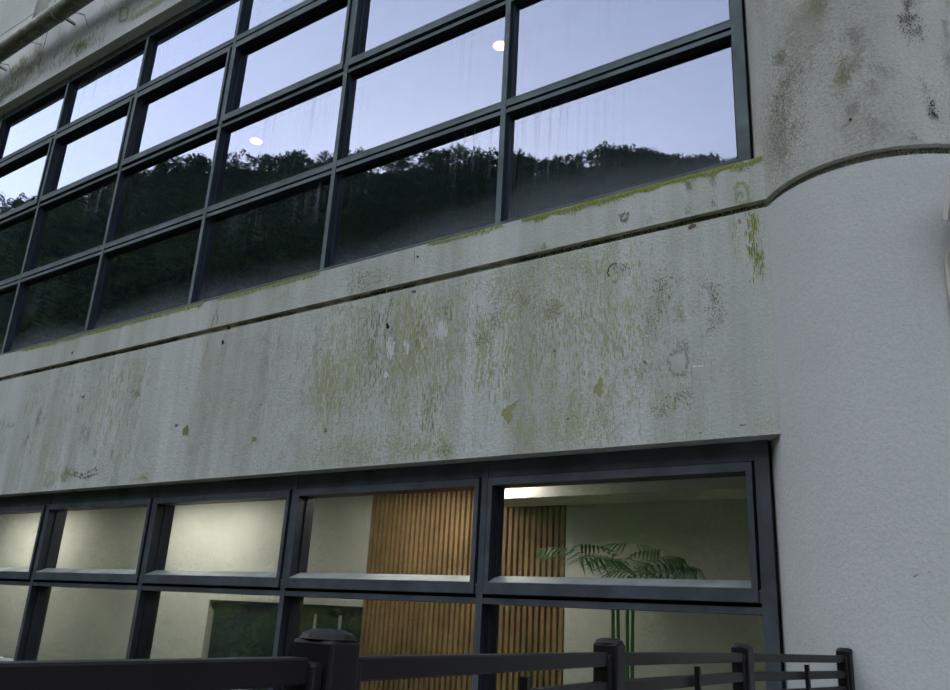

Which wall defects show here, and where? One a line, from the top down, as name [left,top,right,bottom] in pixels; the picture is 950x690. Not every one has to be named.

mould [897,0,929,46]
mould [762,0,902,184]
water stain [919,76,939,119]
water stain [386,302,452,360]
mould [642,268,730,341]
water stain [620,335,695,417]